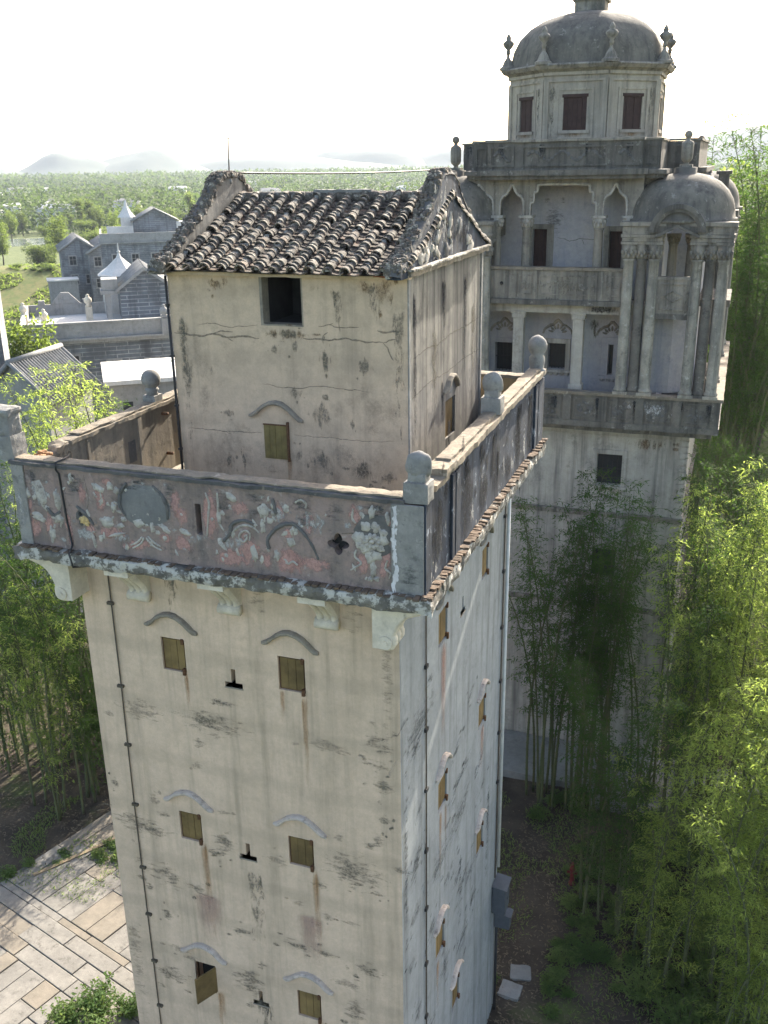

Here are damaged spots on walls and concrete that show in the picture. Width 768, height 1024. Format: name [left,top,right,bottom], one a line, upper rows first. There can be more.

leakage [179,318,193,393]
crack [174,323,259,340]
peeling [16,477,328,572]
flaking render [352,505,399,593]